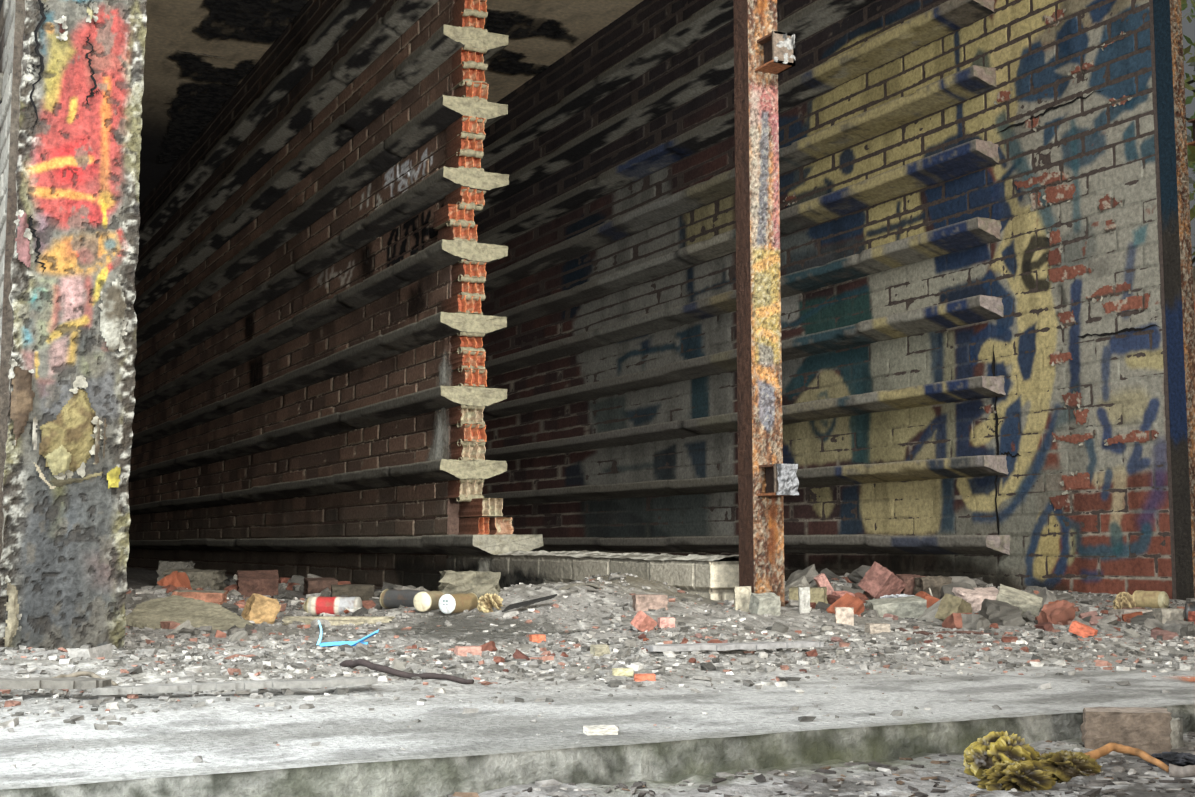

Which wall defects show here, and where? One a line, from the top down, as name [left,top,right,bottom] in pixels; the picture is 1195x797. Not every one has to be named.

peeling [54,15,68,41]
peeling [86,2,99,23]
crack [85,35,102,105]
crack [997,90,1104,133]
peeling [14,209,34,267]
peeling [1046,228,1093,283]
peeling [98,274,127,352]
peeling [1086,282,1151,315]
spalling [8,359,121,489]
peeling [1052,391,1159,446]
peeling [1049,471,1090,511]
peeling [3,575,22,647]